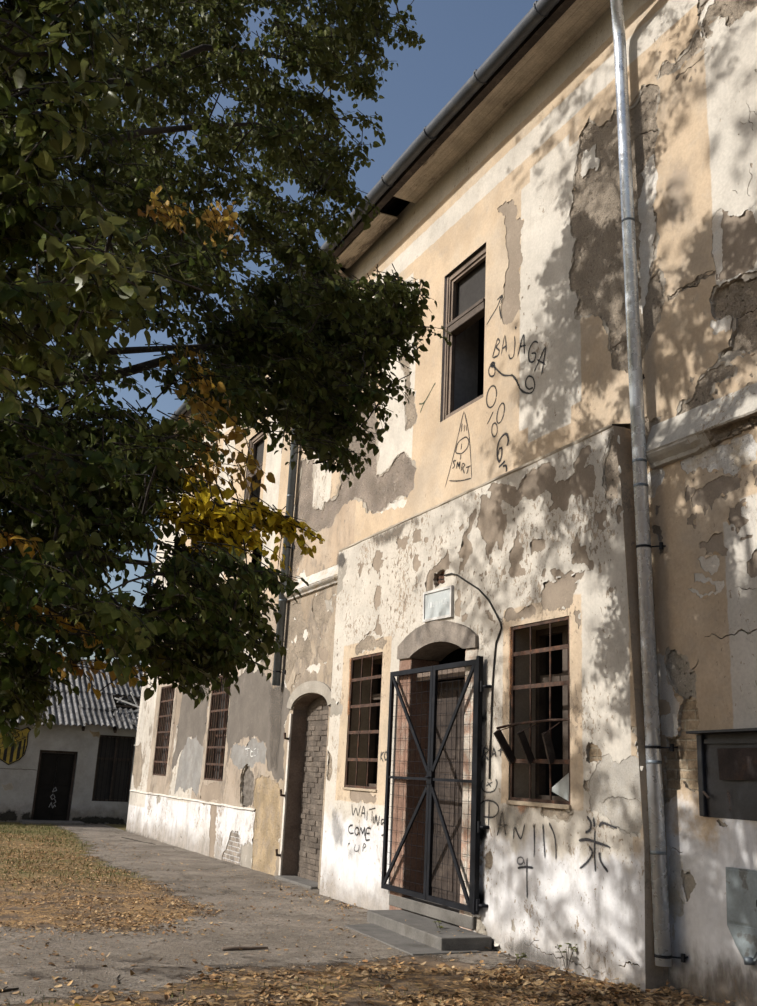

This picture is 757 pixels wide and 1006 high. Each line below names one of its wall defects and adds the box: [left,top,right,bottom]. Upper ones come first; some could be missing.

peeling [497,199,530,325]
flaking render [569,110,628,373]
flaking render [629,0,757,416]
flaking render [294,402,417,541]
peeling [647,467,665,555]
peeling [680,417,757,599]
peeling [168,430,624,876]
crack [704,629,757,639]
peeling [583,726,644,838]
flaking render [656,646,700,805]
peeling [668,847,696,948]